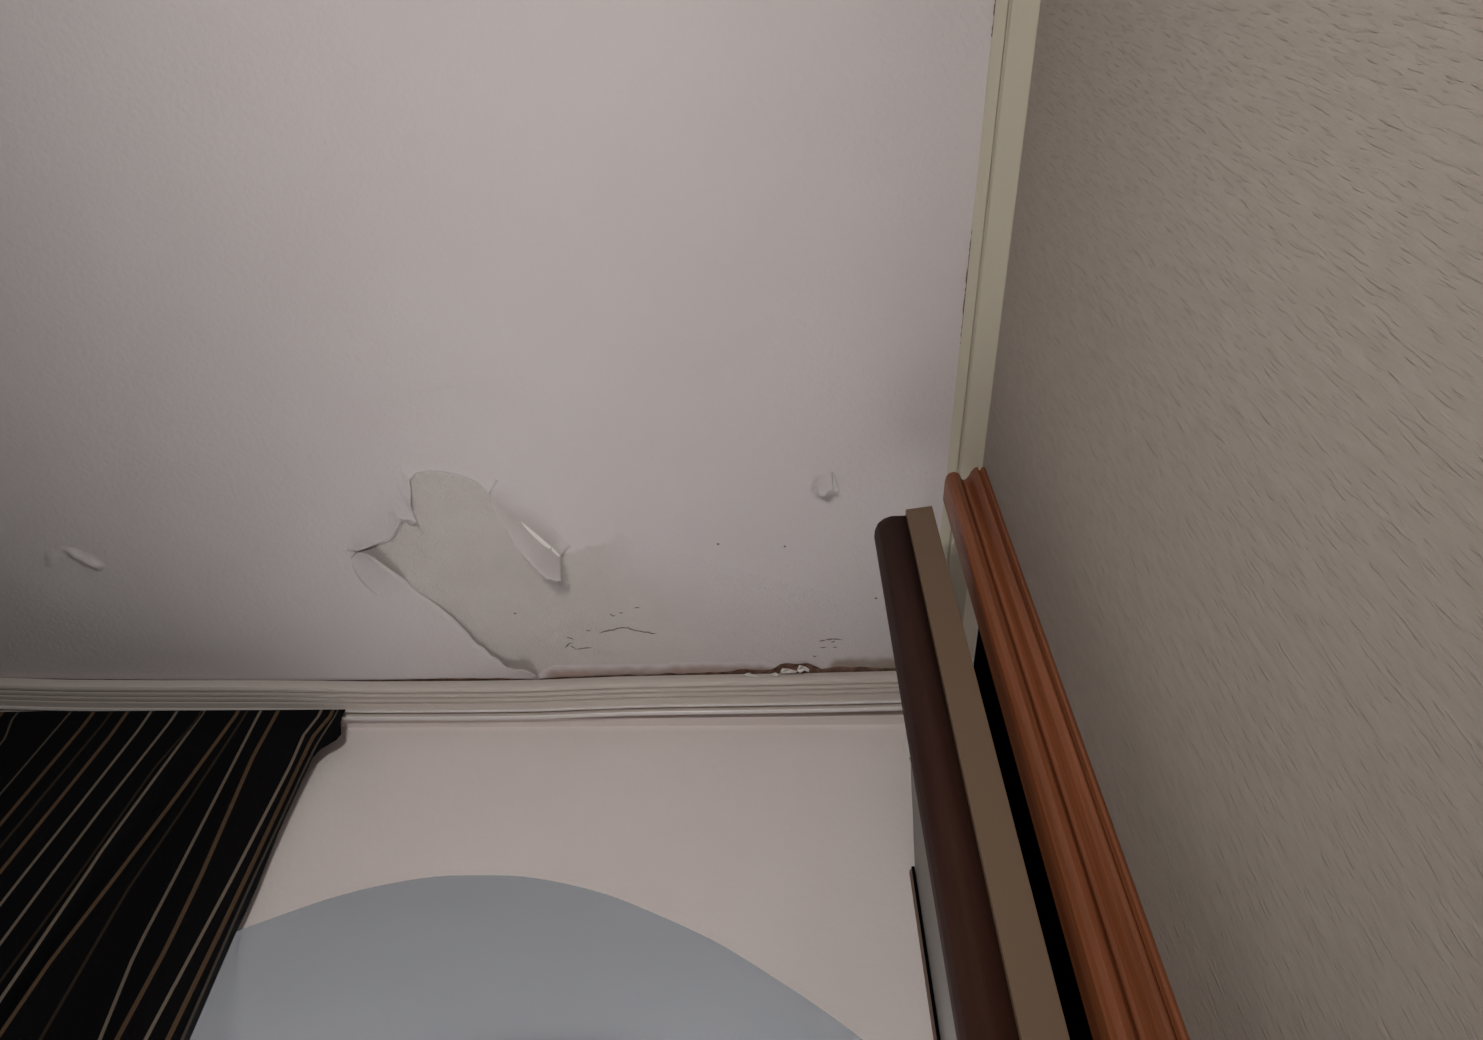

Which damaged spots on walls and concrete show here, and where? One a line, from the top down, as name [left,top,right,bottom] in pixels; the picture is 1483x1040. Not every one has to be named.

peeling [346,458,893,680]